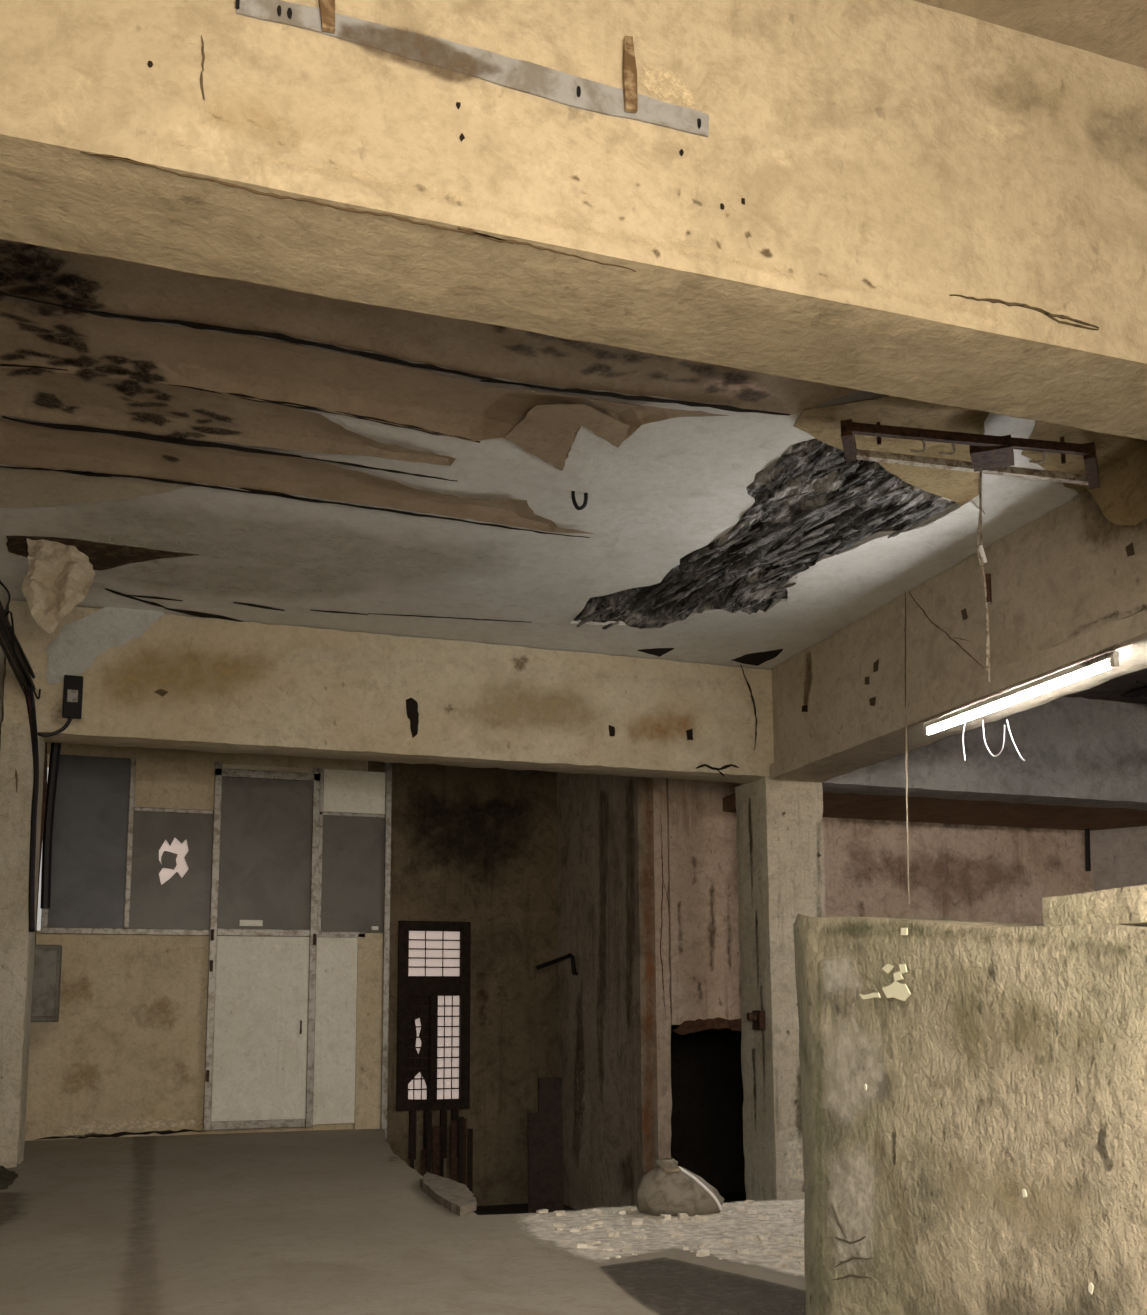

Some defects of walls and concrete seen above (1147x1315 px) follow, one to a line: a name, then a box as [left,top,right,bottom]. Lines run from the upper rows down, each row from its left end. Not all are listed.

crack [81,151,636,272]
water stain [0,243,240,462]
crack [0,291,790,416]
crack [950,294,1099,330]
crack [168,384,480,443]
peeling [0,239,991,630]
peeling [1021,420,1147,526]
peeling [6,536,199,685]
spalling [637,648,674,657]
spalling [731,649,783,666]
spalling [1081,646,1119,668]
water stain [819,912,971,937]